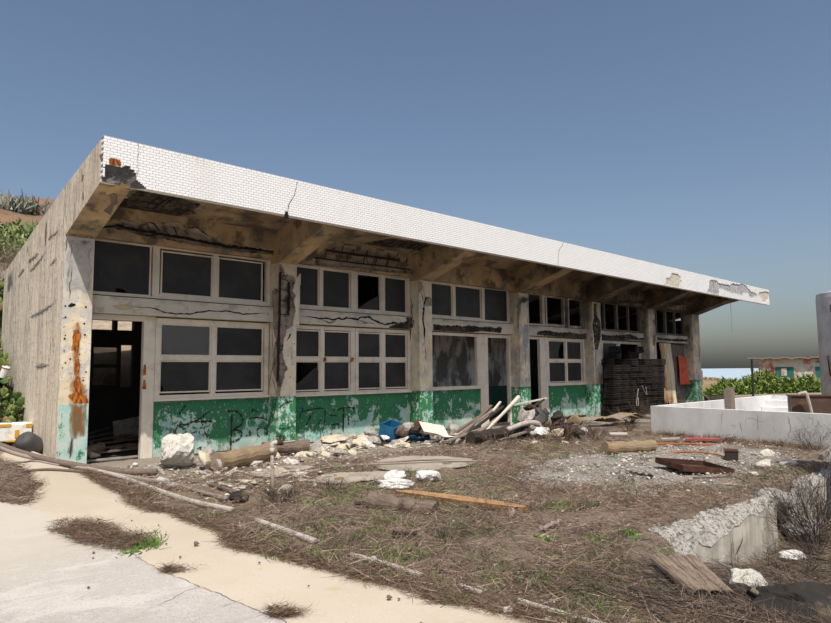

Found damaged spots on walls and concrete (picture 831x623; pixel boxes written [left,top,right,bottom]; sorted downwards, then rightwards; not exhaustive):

spalling [102,164,274,255]
crack [104,222,273,252]
crack [134,306,260,315]
spalling [271,263,296,398]
crack [307,290,426,375]
spalling [523,303,643,350]
peeling [665,273,682,288]
peeling [707,279,769,303]
rust [68,323,88,457]
peeling [298,420,364,442]